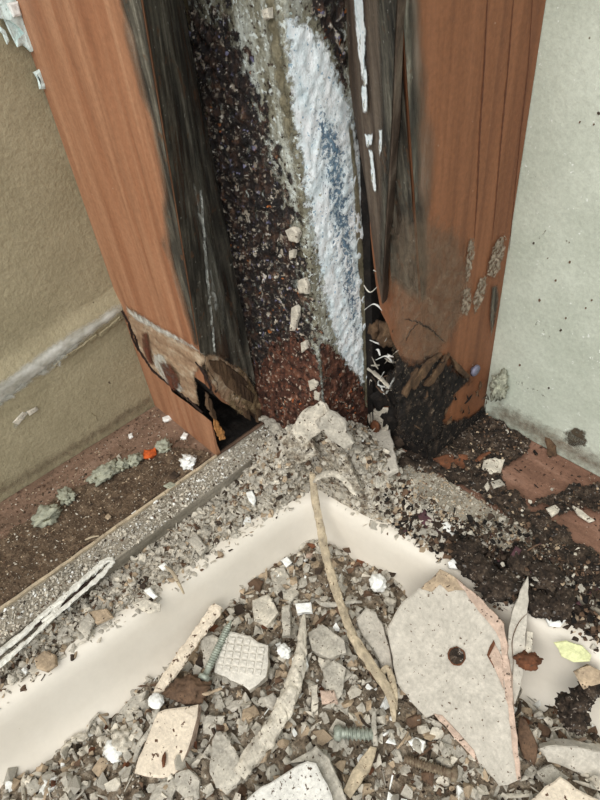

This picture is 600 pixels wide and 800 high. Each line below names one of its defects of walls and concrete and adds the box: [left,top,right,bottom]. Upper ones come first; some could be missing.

water stain [265,0,296,179]
water stain [354,0,367,112]
water stain [122,0,255,382]
water stain [365,0,507,463]
spalling [160,363,178,390]
peeling [213,418,226,440]
crack [405,318,444,342]